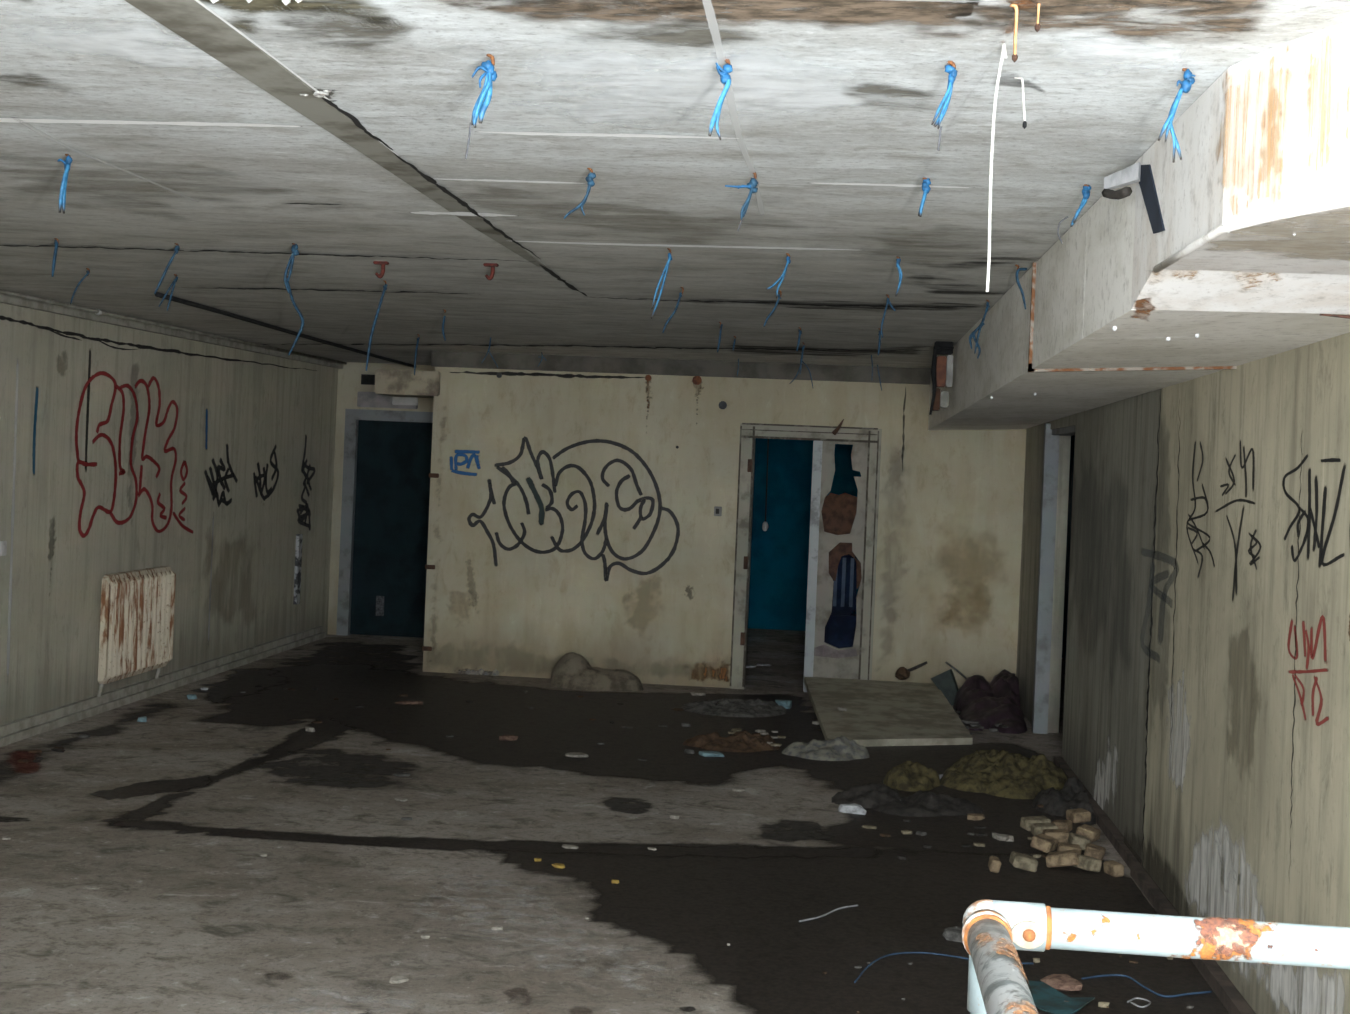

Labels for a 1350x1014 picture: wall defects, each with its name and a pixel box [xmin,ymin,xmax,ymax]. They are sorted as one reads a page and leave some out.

damp [200,0,407,47]
damp [475,0,1260,122]
rust [1217,35,1350,215]